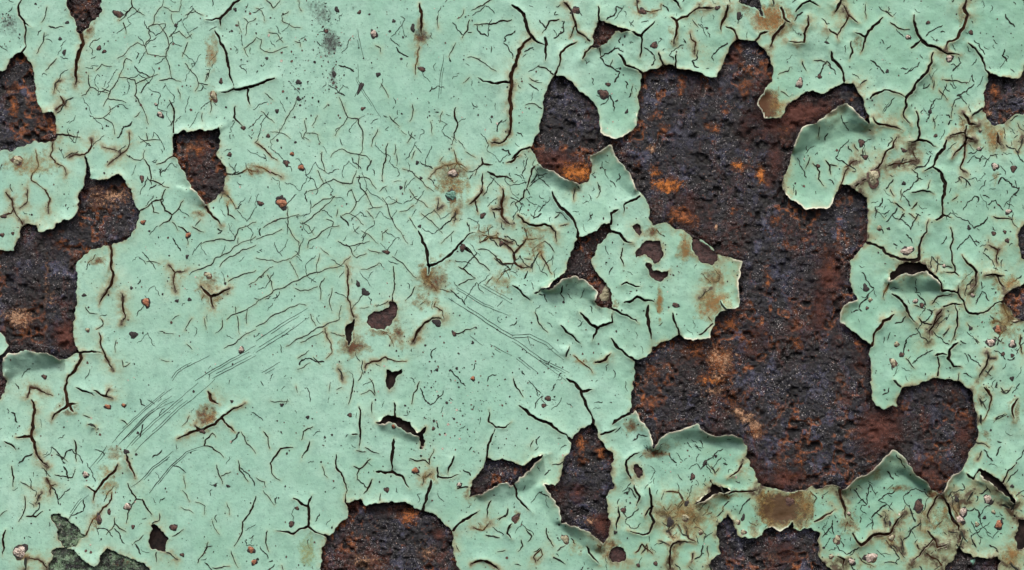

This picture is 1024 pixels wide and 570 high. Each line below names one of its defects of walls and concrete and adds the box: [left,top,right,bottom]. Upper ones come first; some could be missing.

peeling [345,301,398,346]
crack [0,0,818,570]
rust [529,0,1024,570]
crack [778,0,1024,425]
crack [799,434,1024,570]